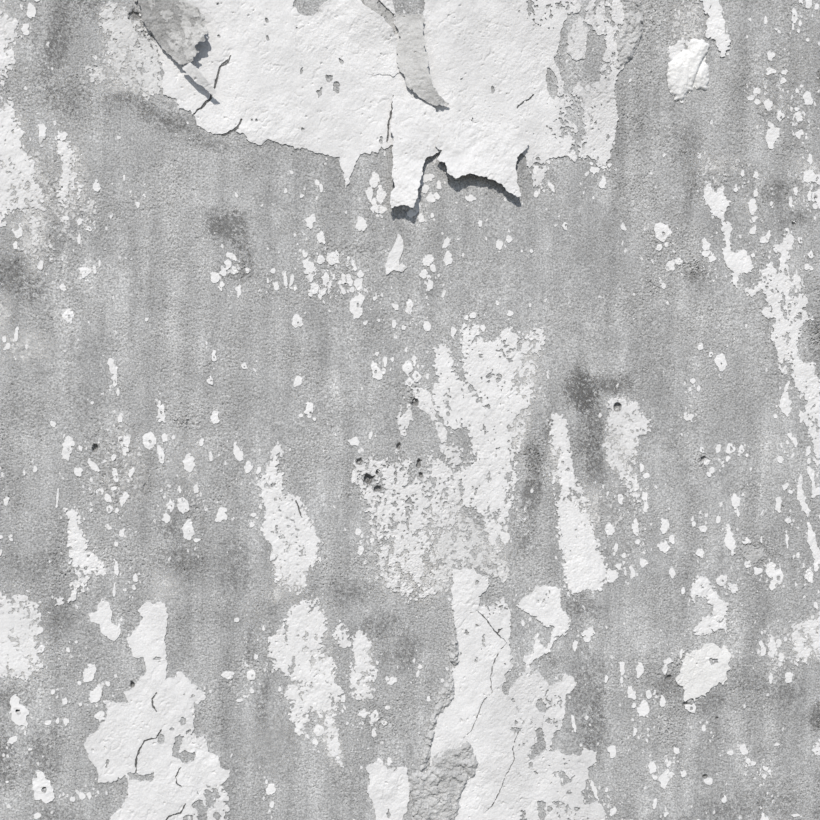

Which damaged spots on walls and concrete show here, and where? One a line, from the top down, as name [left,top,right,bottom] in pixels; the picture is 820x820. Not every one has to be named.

peeling [0,0,101,273]
peeling [85,0,644,223]
peeling [697,149,820,591]
peeling [10,694,29,727]
peeling [0,591,45,682]
peeling [32,770,55,804]
peeling [55,484,230,820]
peeling [233,442,397,768]
peeling [351,312,652,820]
peeling [619,661,666,717]
peeling [657,519,675,553]
peeling [662,575,738,713]